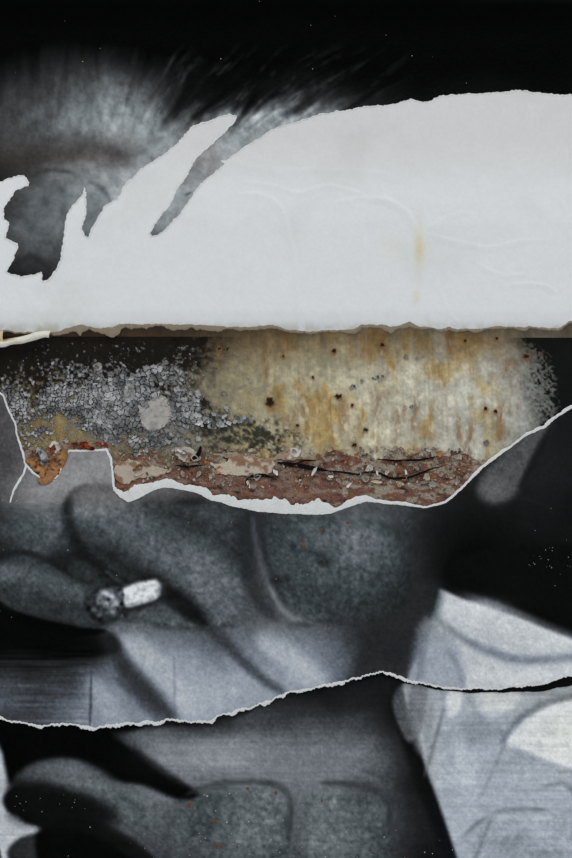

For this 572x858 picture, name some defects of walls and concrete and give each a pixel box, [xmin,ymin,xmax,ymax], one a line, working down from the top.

peeling [0,339,318,484]
rust [23,426,487,507]